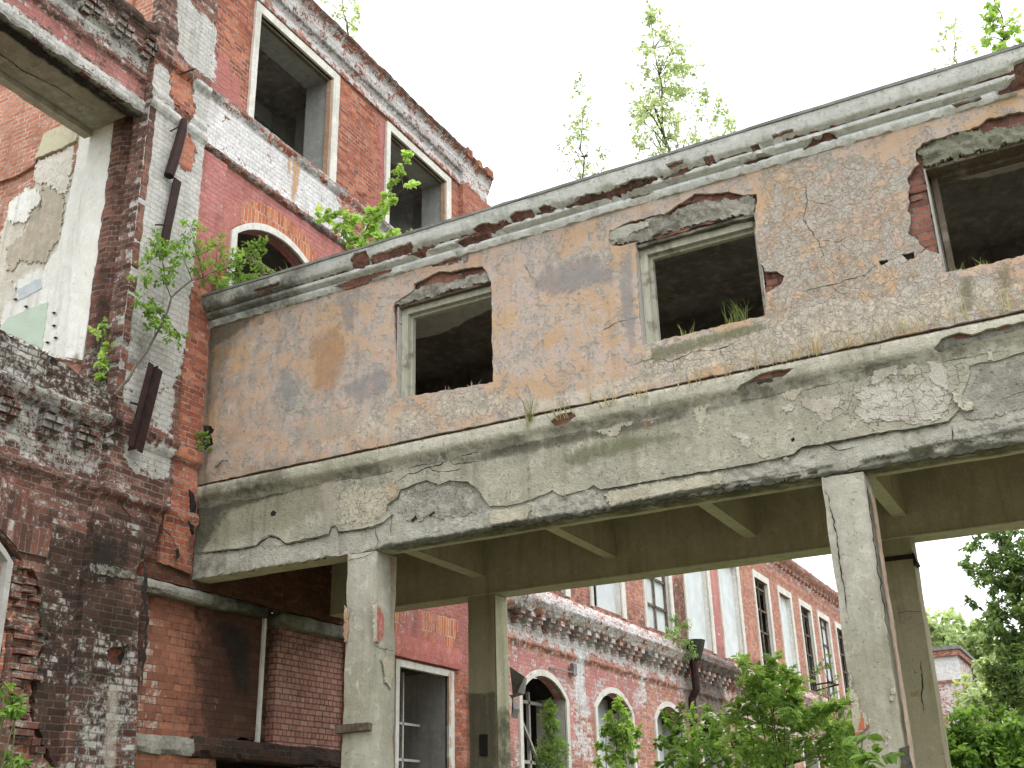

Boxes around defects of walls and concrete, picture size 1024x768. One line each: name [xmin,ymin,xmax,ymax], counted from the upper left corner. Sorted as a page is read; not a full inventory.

peeling [0,125,83,364]
spalling [338,162,691,310]
spalling [609,195,756,251]
crack [803,183,877,294]
spalling [909,113,1024,202]
peeling [854,323,1024,457]
spalling [337,432,818,527]
crack [594,416,955,639]
spalling [4,559,48,768]